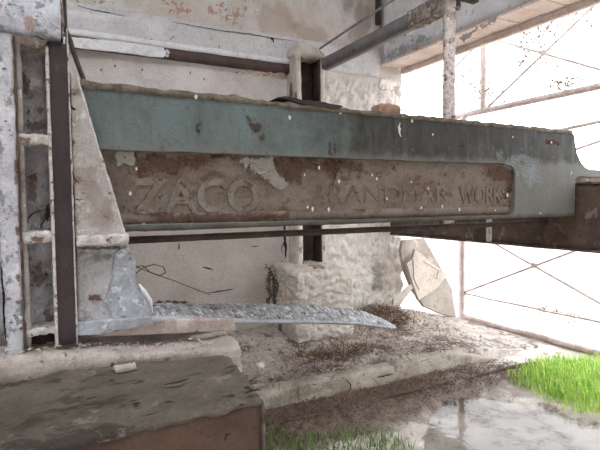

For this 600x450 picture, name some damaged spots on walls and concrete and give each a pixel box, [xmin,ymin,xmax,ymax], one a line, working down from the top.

peeling [385,0,443,61]
peeling [457,17,497,44]
corrosion [246,116,264,141]
peeling [63,29,170,344]
peeling [239,156,288,190]
corrosion [274,142,366,185]